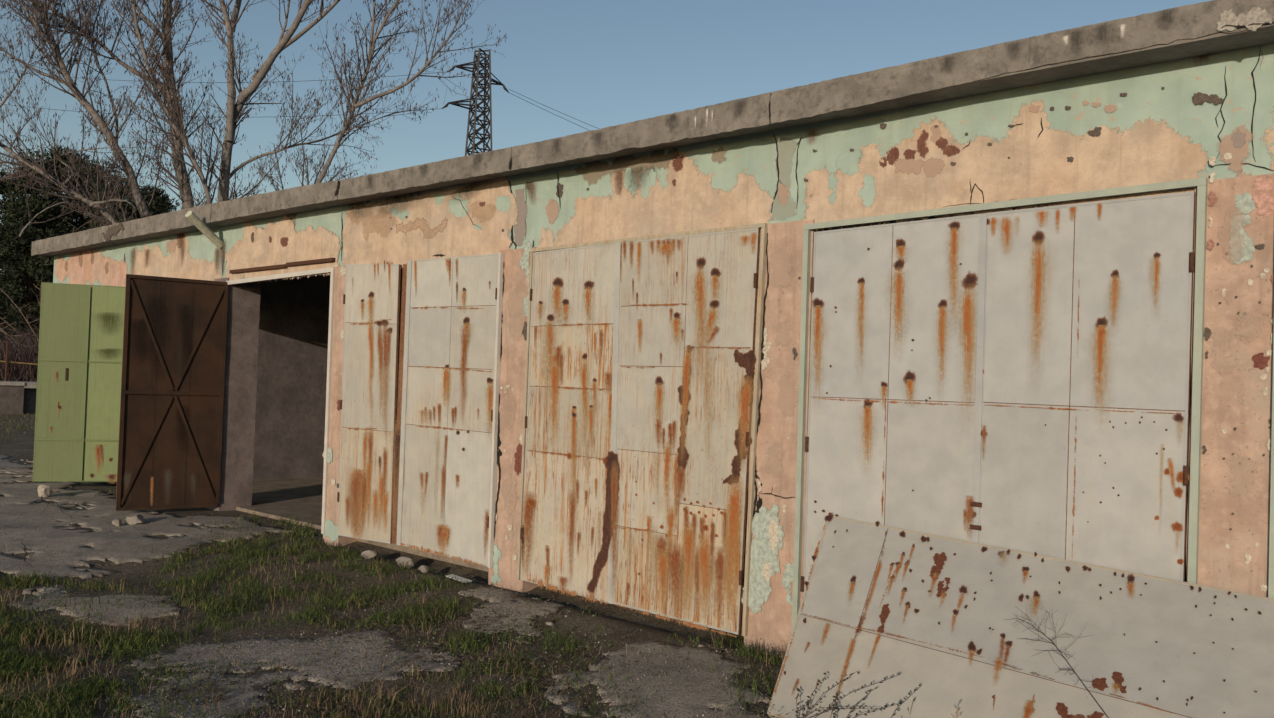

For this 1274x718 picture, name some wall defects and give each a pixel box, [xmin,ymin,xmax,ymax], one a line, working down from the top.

rust [346,259,493,529]
peeling [55,152,790,340]
rust [529,238,756,637]
crack [753,101,802,516]
rust [819,371,965,453]
rust [938,222,984,377]
peeling [800,92,1274,265]
crack [1214,48,1274,171]
spalling [1252,317,1274,396]
peeling [741,470,794,614]
rust [770,471,982,718]
rust [1090,672,1171,713]